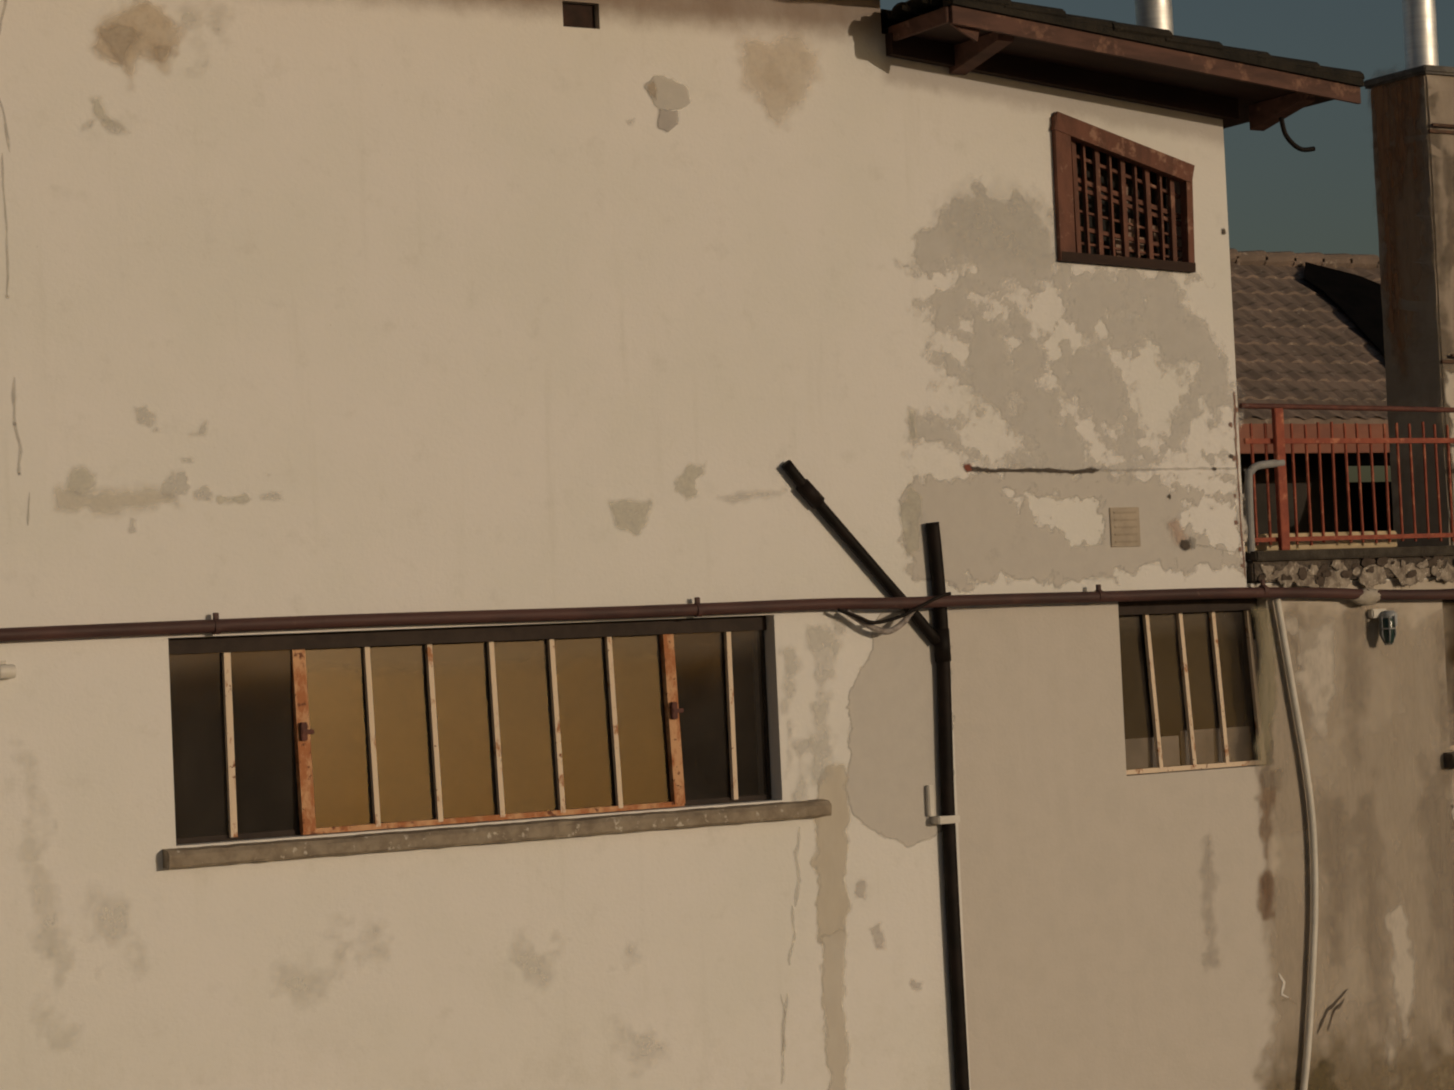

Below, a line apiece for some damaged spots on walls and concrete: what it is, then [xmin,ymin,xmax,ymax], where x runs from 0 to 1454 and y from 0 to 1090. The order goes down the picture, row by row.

damp [96,2,178,72]
spalling [645,76,690,131]
peeling [900,183,1454,606]
damp [811,765,850,1090]
peeling [845,608,955,847]
damp [1256,607,1454,1090]